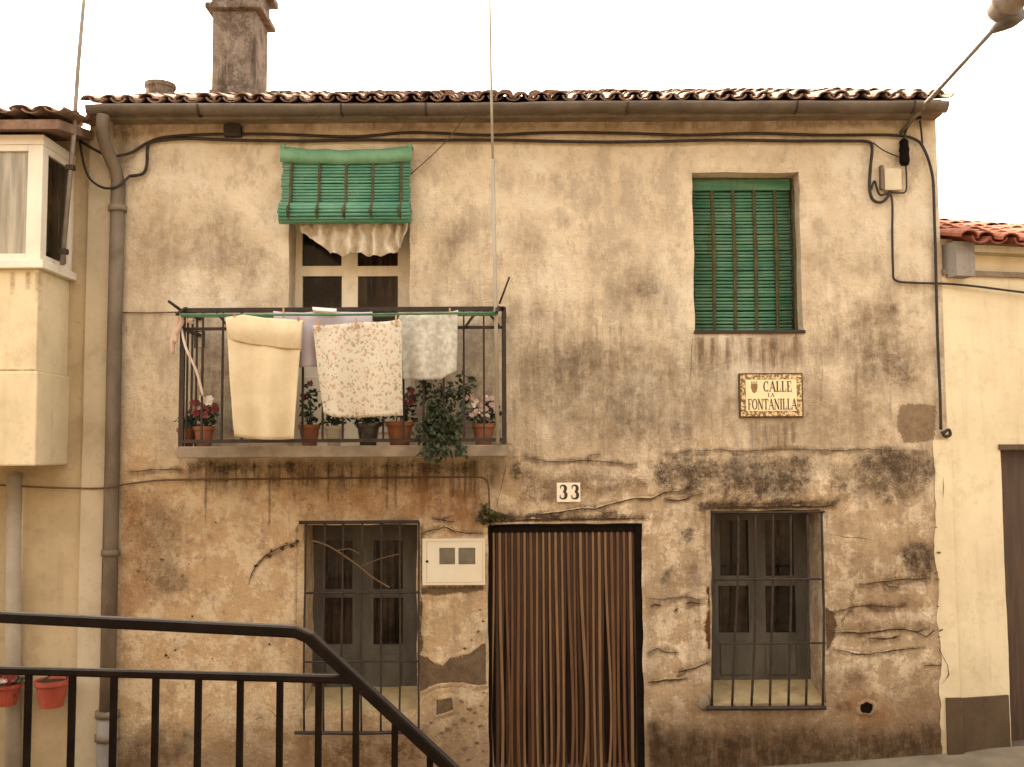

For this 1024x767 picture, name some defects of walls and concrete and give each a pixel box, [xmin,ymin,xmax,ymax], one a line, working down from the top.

spalling [897,403,937,443]
crack [420,452,834,534]
water stain [654,456,808,508]
water stain [836,452,932,502]
crack [248,540,299,585]
water stain [904,543,933,576]
spalling [420,585,486,622]
crack [646,595,704,612]
crack [832,576,949,684]
spalling [417,609,488,761]
crack [647,647,711,683]